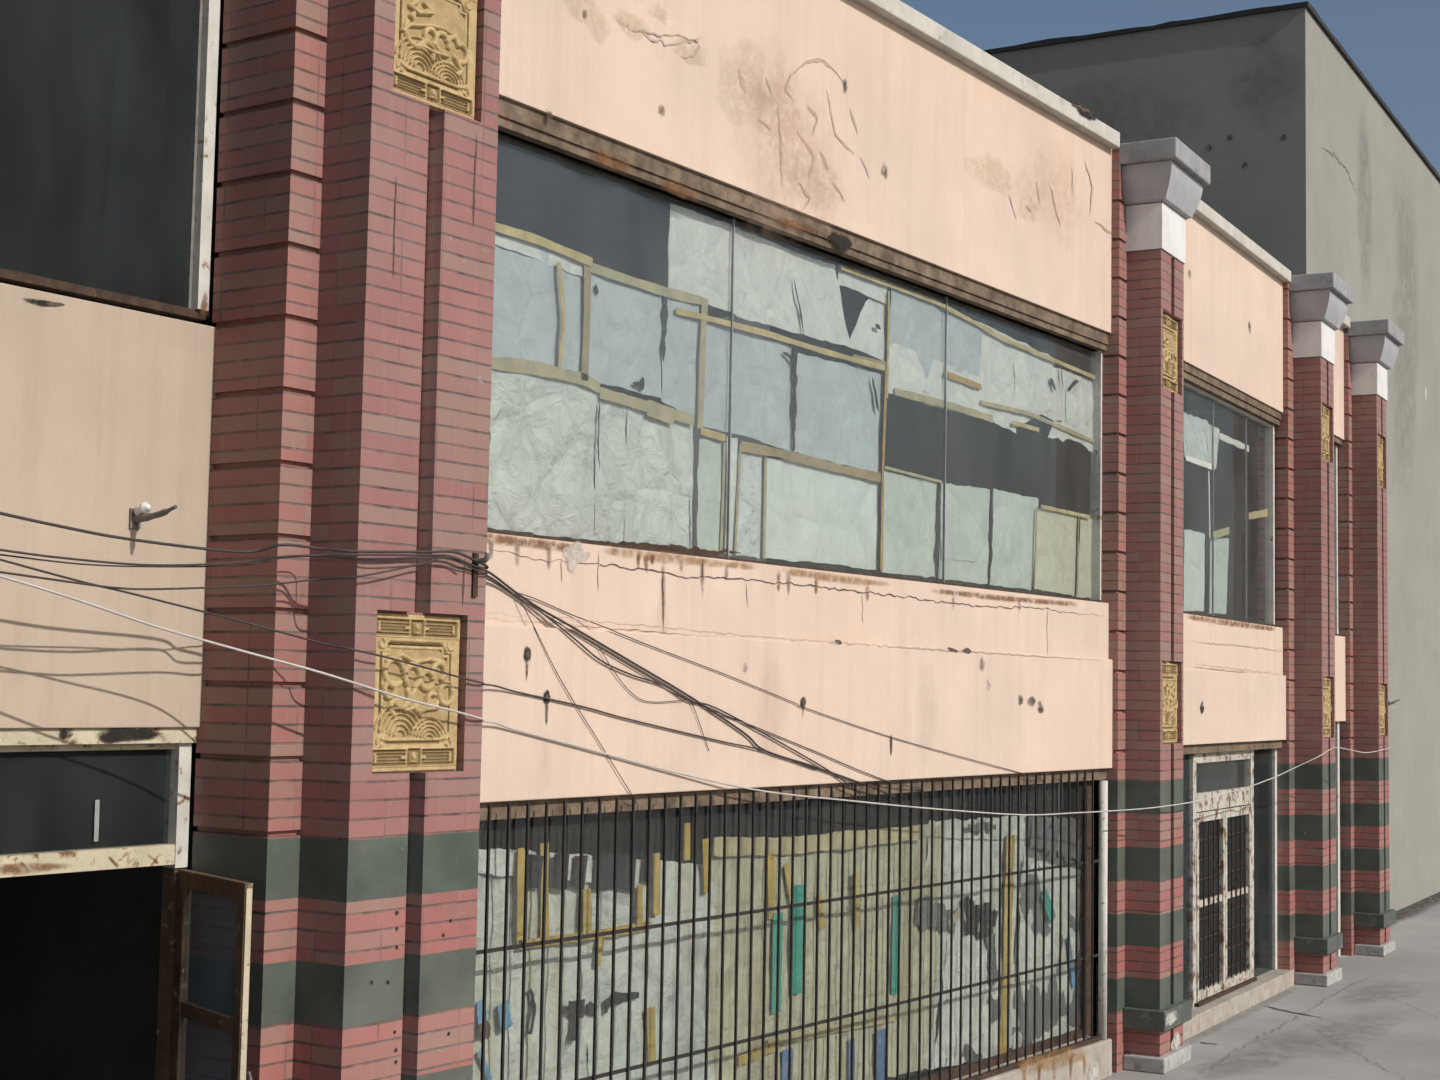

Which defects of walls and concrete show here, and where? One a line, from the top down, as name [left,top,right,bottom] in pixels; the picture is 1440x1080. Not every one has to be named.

corrosion [487,534,570,565]
corrosion [613,549,749,581]
corrosion [778,570,875,599]
corrosion [0,863,59,873]